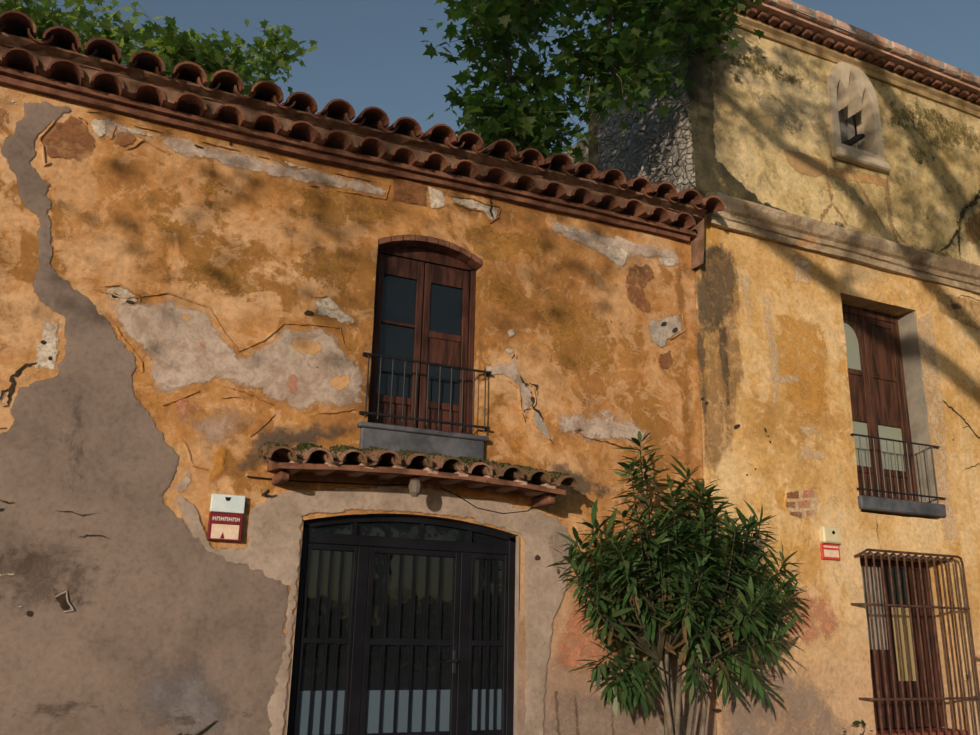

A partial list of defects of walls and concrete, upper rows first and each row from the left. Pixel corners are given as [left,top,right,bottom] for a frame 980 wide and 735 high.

peeling [38,115,95,167]
leakage [890,101,980,164]
crack [820,169,848,226]
crack [939,190,980,259]
crack [0,362,37,429]
flaking render [96,284,369,443]
spalling [482,329,551,439]
leakage [552,222,750,464]
spalling [648,313,685,347]
leakage [762,297,827,423]
crack [929,391,980,439]
flaking render [784,486,823,518]